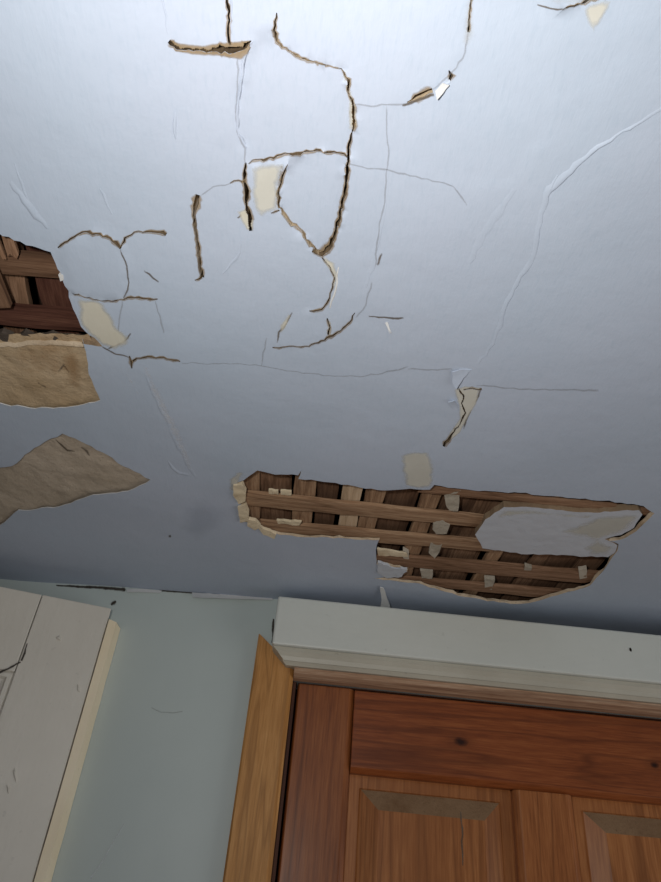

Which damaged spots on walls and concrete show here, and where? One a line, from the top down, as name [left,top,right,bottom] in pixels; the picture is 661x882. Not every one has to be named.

crack [466,0,474,32]
crack [402,71,455,106]
crack [168,0,402,349]
crack [58,230,166,302]
spalling [0,302,126,409]
crack [103,333,180,368]
spalling [0,434,150,525]
spalling [231,473,302,539]
flaking render [404,453,432,487]
peeling [475,501,642,557]
spalling [377,547,408,608]